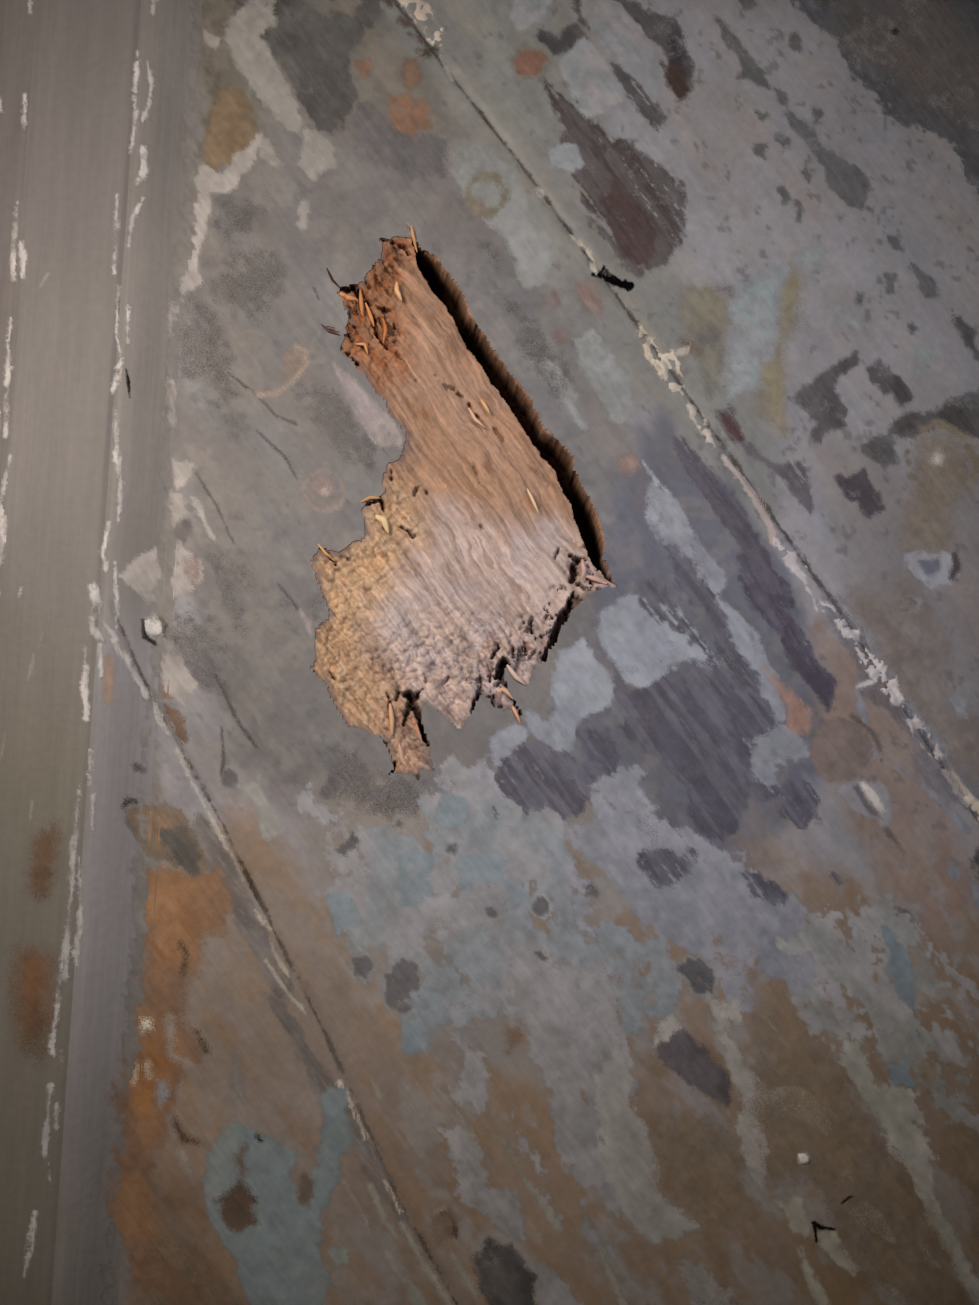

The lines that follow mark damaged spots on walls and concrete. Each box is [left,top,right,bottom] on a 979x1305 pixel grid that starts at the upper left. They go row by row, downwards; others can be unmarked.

spalling [0,317,23,597]
spalling [9,201,28,282]
peeling [79,50,257,724]
peeling [163,0,451,442]
peeling [541,76,691,281]
peeling [610,61,668,133]
crack [382,0,979,825]
peeling [714,15,875,217]
peeling [788,0,979,201]
spalling [47,748,97,1069]
peeling [191,810,455,1305]
spalling [277,224,979,1305]